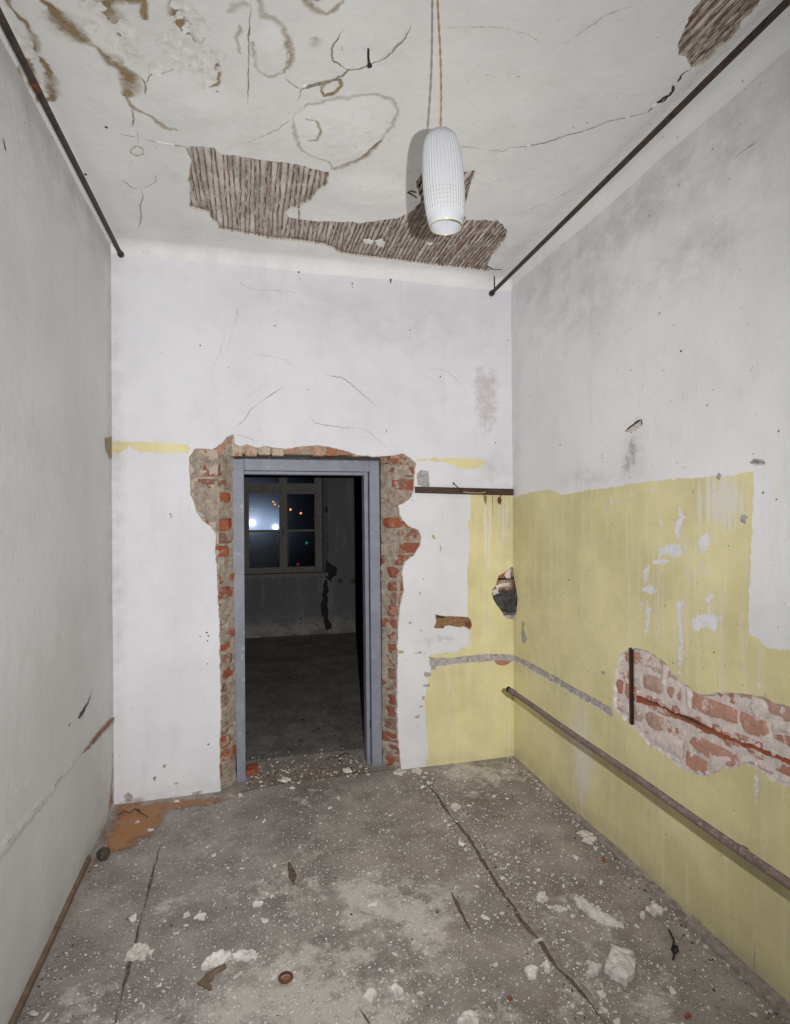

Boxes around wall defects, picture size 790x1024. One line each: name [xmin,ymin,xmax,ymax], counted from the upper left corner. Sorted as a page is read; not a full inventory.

water stain [17,44,56,102]
water stain [40,0,87,42]
water stain [100,0,148,35]
water stain [98,49,170,129]
crack [225,13,411,152]
crack [471,69,691,152]
flaking render [677,0,761,68]
flaking render [185,146,508,272]
flaking render [189,435,441,790]
flaking render [492,567,527,643]
flaking render [601,595,790,813]
corrosion [105,774,221,853]